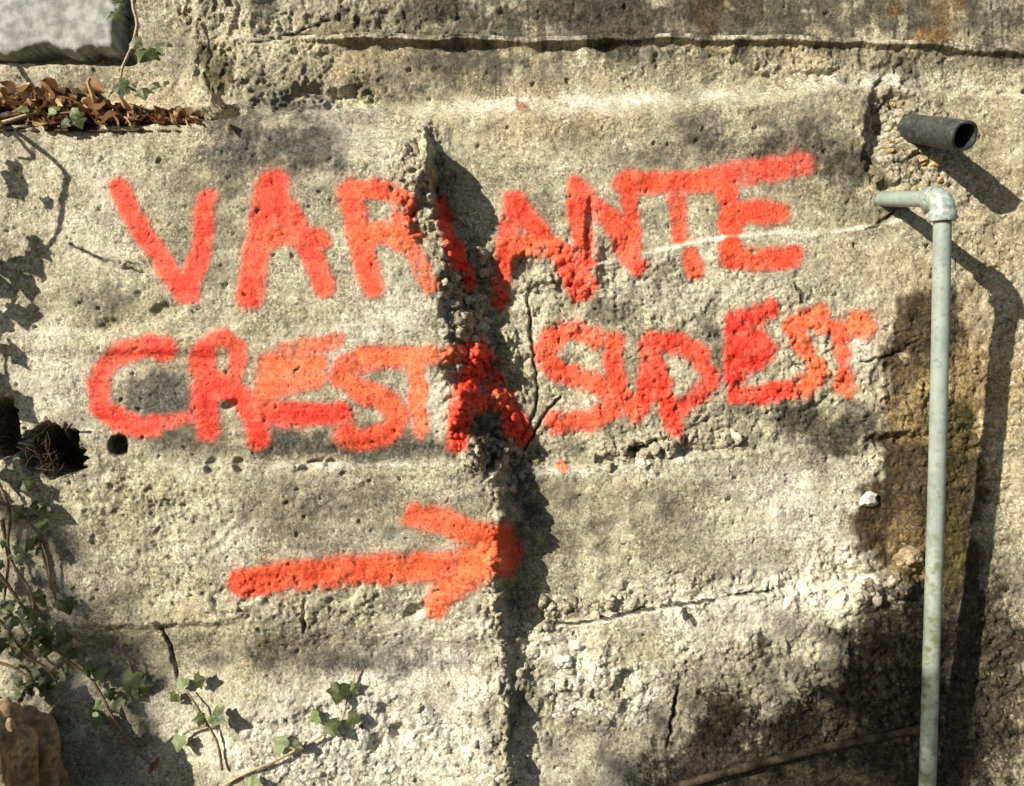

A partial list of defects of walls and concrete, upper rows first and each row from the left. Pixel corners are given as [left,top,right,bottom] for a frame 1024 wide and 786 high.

crack [512,302,561,455]
water stain [851,288,932,628]
water stain [942,286,994,653]
crack [151,621,179,678]
crack [545,588,774,627]
crack [669,684,679,734]